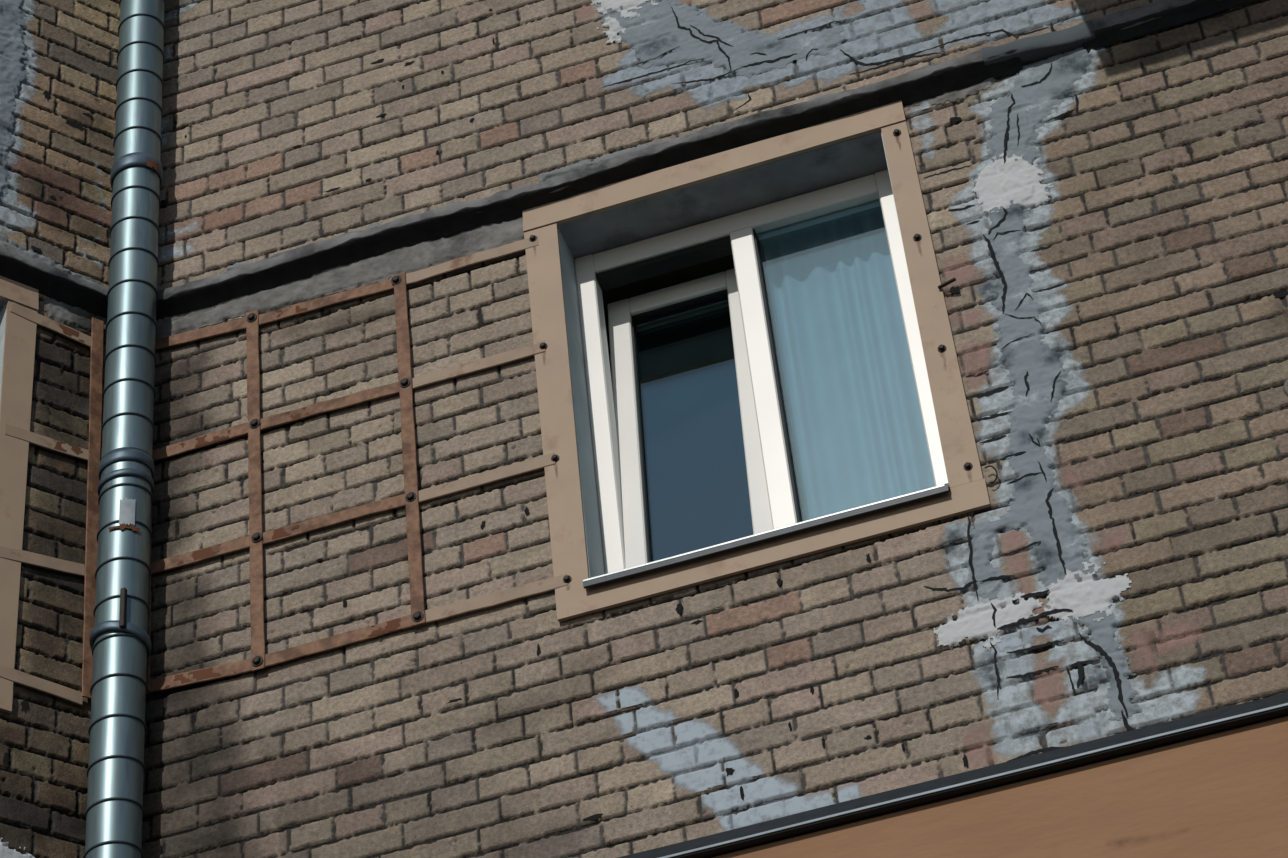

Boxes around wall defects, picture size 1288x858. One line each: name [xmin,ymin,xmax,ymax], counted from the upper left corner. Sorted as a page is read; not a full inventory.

crack [603,7,1079,163]
crack [925,165,971,178]
crack [924,204,1134,731]
corrosion [177,544,221,565]
corrosion [368,618,401,637]